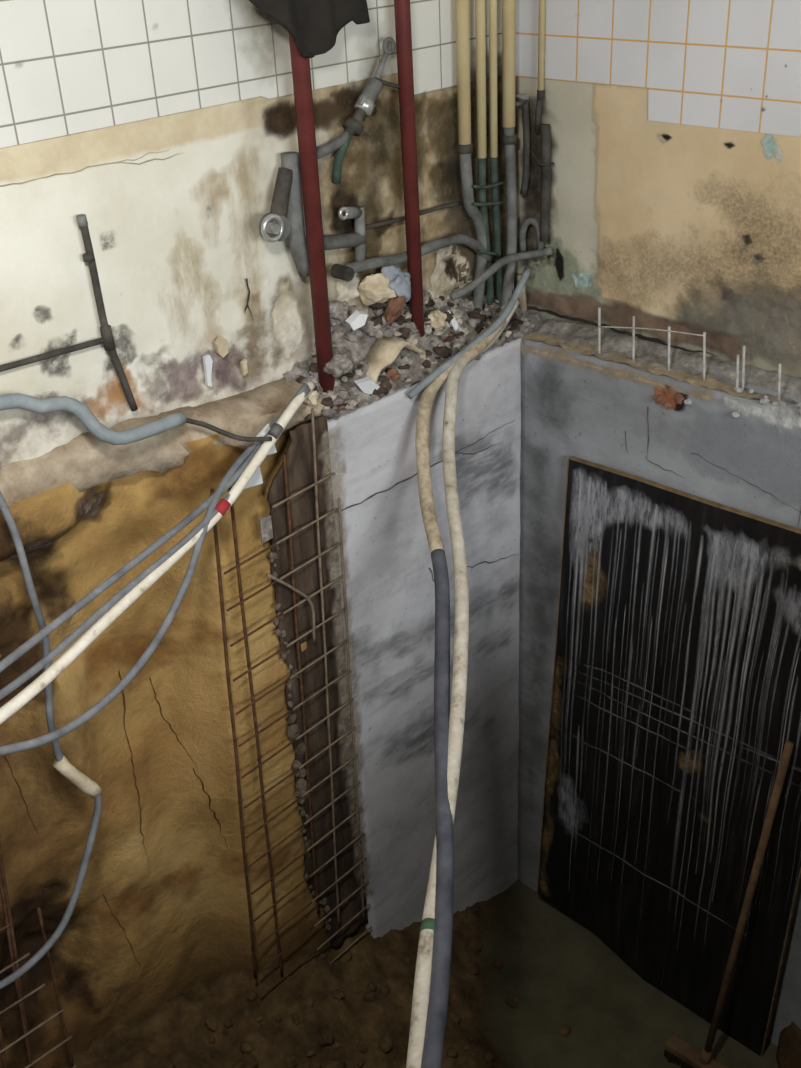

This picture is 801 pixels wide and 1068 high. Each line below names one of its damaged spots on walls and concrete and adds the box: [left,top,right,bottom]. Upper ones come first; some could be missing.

spalling [331,192,357,234]
peeling [526,84,801,361]
peeling [272,282,304,356]
leakage [677,282,801,363]
crack [335,421,513,513]
crack [625,407,801,524]
crack [119,671,150,876]
crack [150,677,228,849]
spalling [213,408,372,998]
leakage [567,482,621,650]
leakage [632,512,770,777]
leakage [0,882,94,1053]